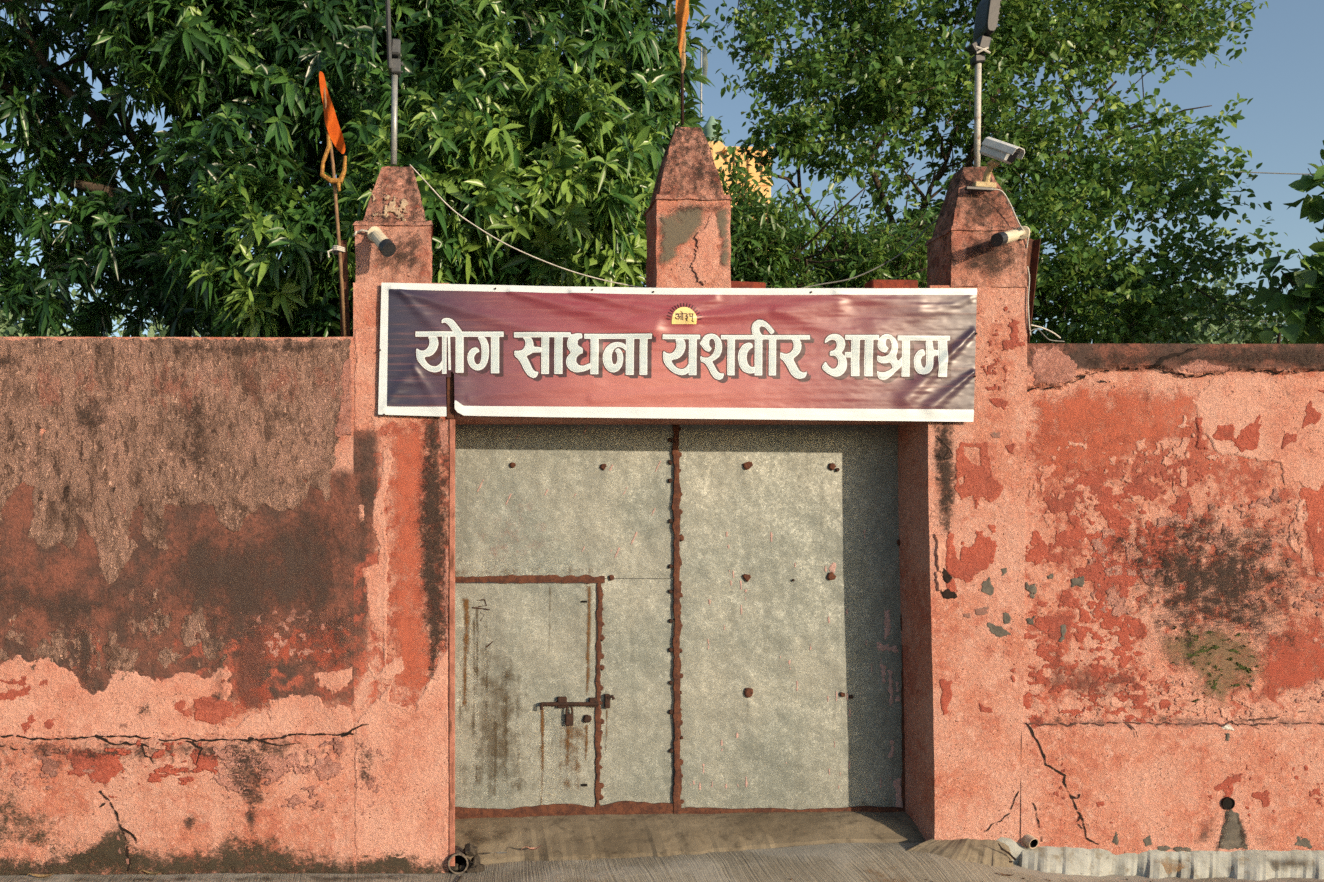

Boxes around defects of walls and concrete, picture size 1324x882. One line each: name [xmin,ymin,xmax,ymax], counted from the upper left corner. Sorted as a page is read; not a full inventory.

peeling [691,213,722,285]
peeling [981,306,1077,410]
peeling [933,359,1324,730]
peeling [0,327,484,873]
damp [173,513,344,708]
crack [93,791,137,871]
crack [0,724,369,765]
crack [986,787,1043,863]
crack [1026,711,1324,845]